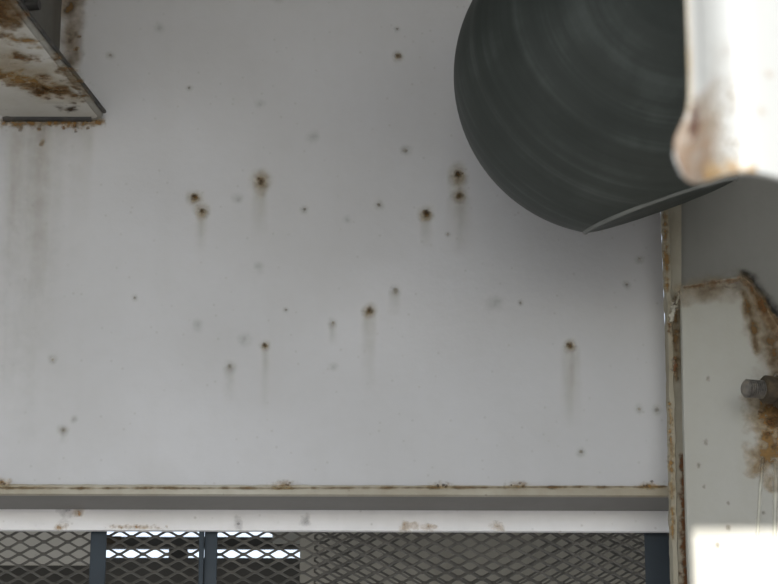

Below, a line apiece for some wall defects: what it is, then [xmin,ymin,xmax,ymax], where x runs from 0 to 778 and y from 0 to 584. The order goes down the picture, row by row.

rust [0,0,89,112]
rust [2,119,104,132]
rust [674,103,757,183]
rust [747,398,778,473]
rust [637,402,687,584]